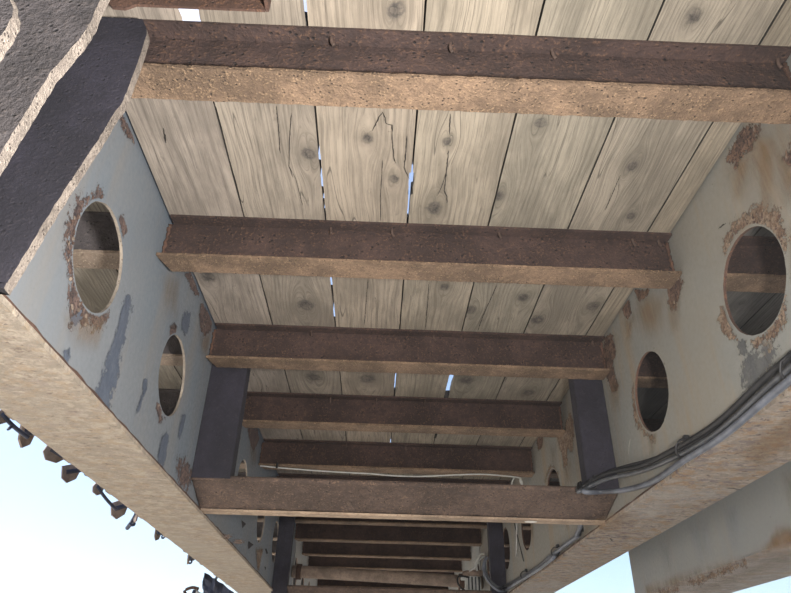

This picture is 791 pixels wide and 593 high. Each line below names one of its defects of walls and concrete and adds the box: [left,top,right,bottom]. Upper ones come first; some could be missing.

rust [120,115,135,144]
crack [372,112,409,221]
crack [438,114,451,202]
rust [726,123,761,171]
peeling [62,182,110,334]
peeling [119,214,128,238]
peeling [722,202,791,255]
peeling [95,291,134,408]
peeling [717,295,788,393]
peeling [136,379,148,413]